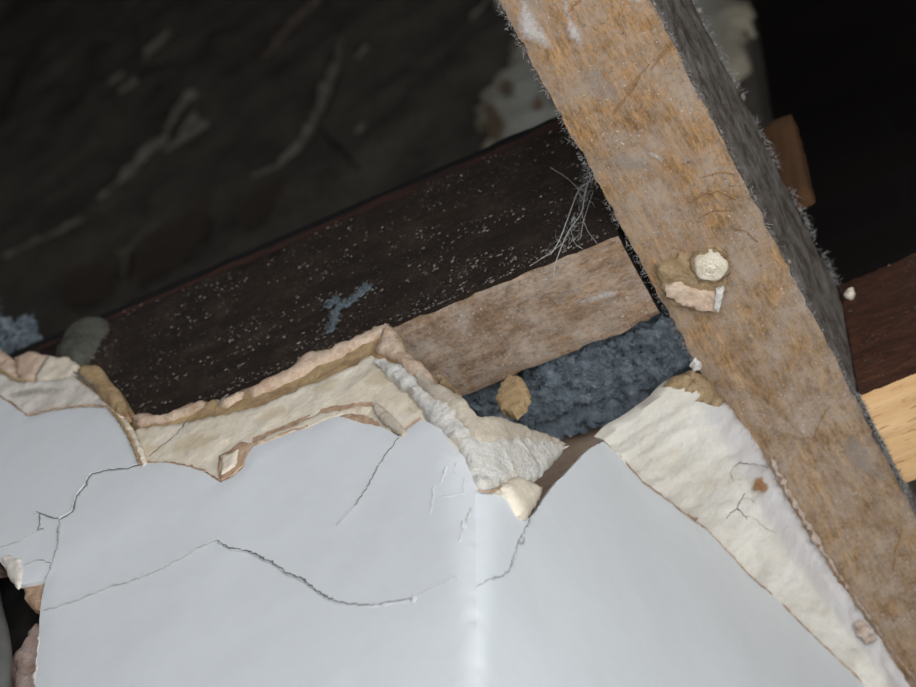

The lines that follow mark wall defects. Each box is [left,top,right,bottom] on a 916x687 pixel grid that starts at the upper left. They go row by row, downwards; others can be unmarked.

crack [0,419,188,579]
crack [43,540,457,611]
flaking render [0,323,568,521]
crack [337,437,399,525]
crack [476,519,530,588]
flaking render [594,370,916,687]